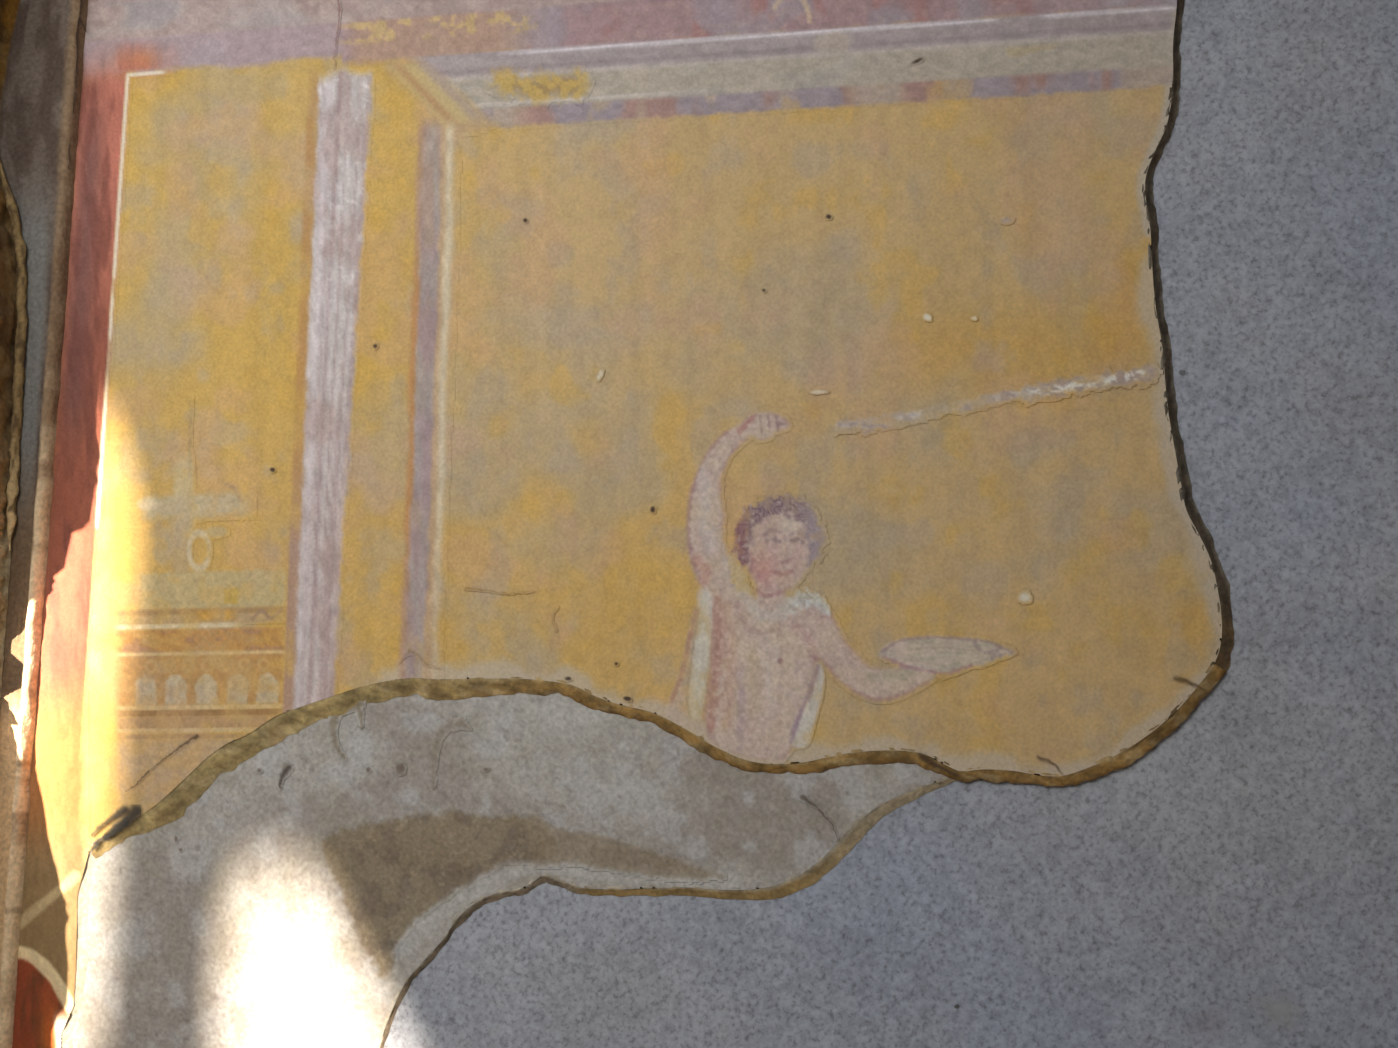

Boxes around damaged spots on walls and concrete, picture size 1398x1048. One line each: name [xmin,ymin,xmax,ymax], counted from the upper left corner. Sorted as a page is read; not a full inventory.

peeling [482,58,596,111]
spalling [831,0,1234,679]
flaking render [61,664,1226,1048]